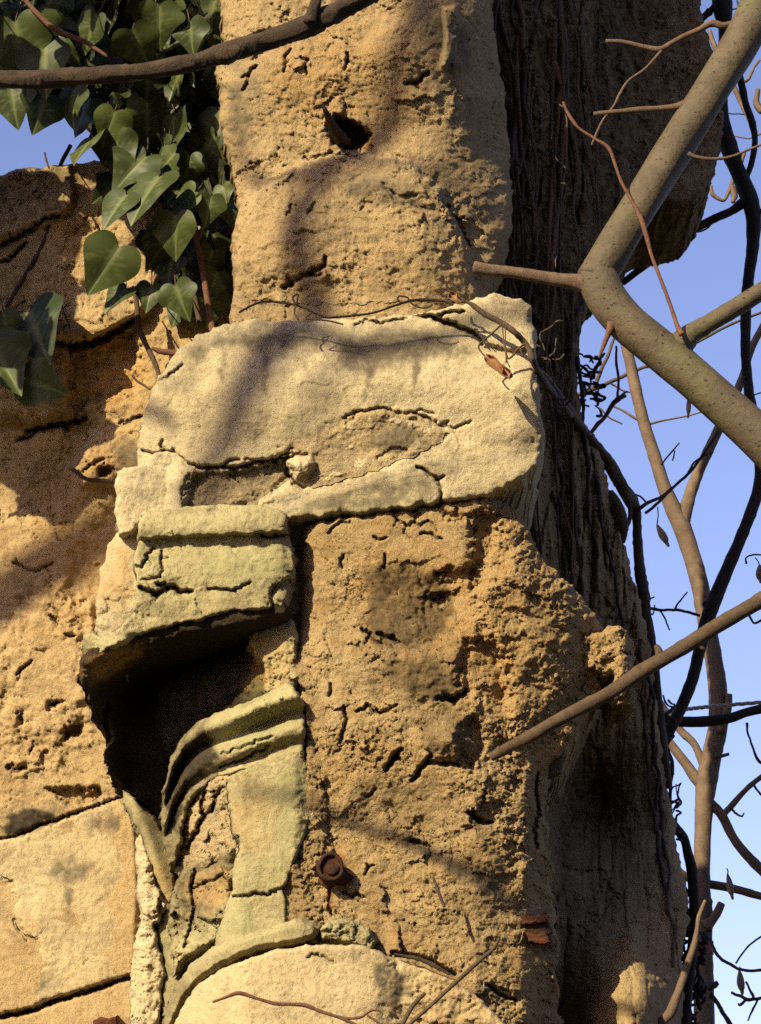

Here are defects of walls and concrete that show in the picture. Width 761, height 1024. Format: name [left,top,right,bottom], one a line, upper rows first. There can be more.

spalling [334,118,369,148]
crack [345,408,471,429]
crack [136,548,250,599]